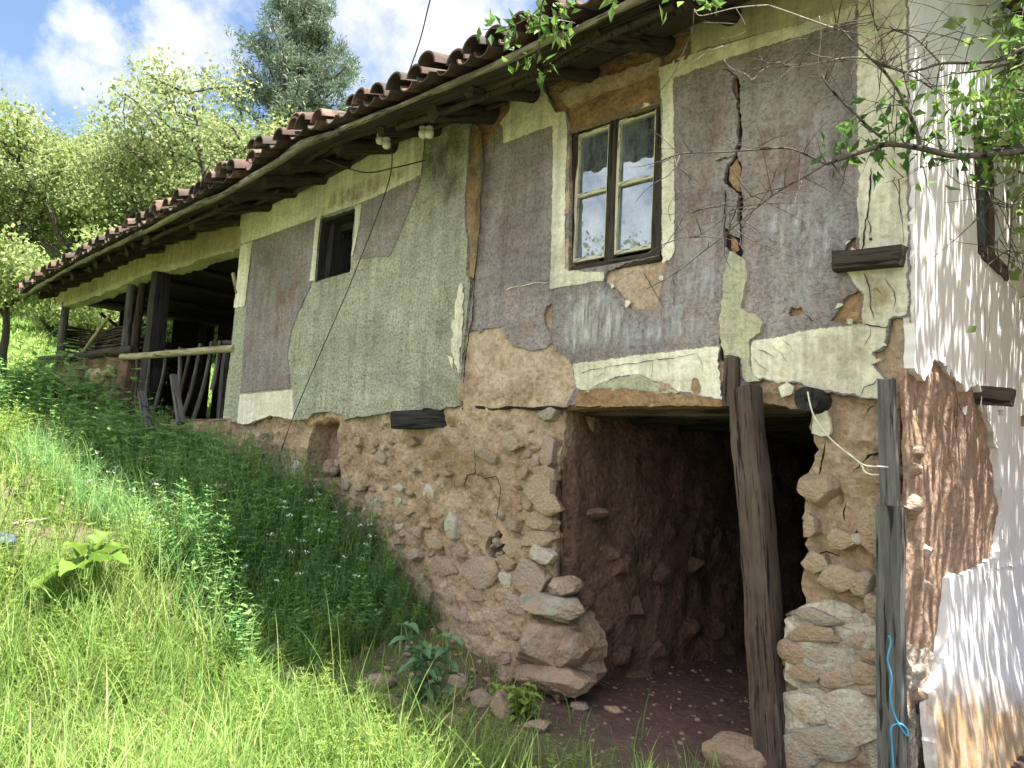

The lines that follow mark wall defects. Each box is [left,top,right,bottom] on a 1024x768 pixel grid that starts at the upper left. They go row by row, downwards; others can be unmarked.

peeling [547,33,691,134]
crack [715,69,744,257]
crack [862,169,872,249]
crack [462,153,567,411]
peeling [606,255,668,310]
spalling [833,292,863,325]
crack [862,274,896,342]
peeling [980,396,997,466]
crack [464,449,501,523]